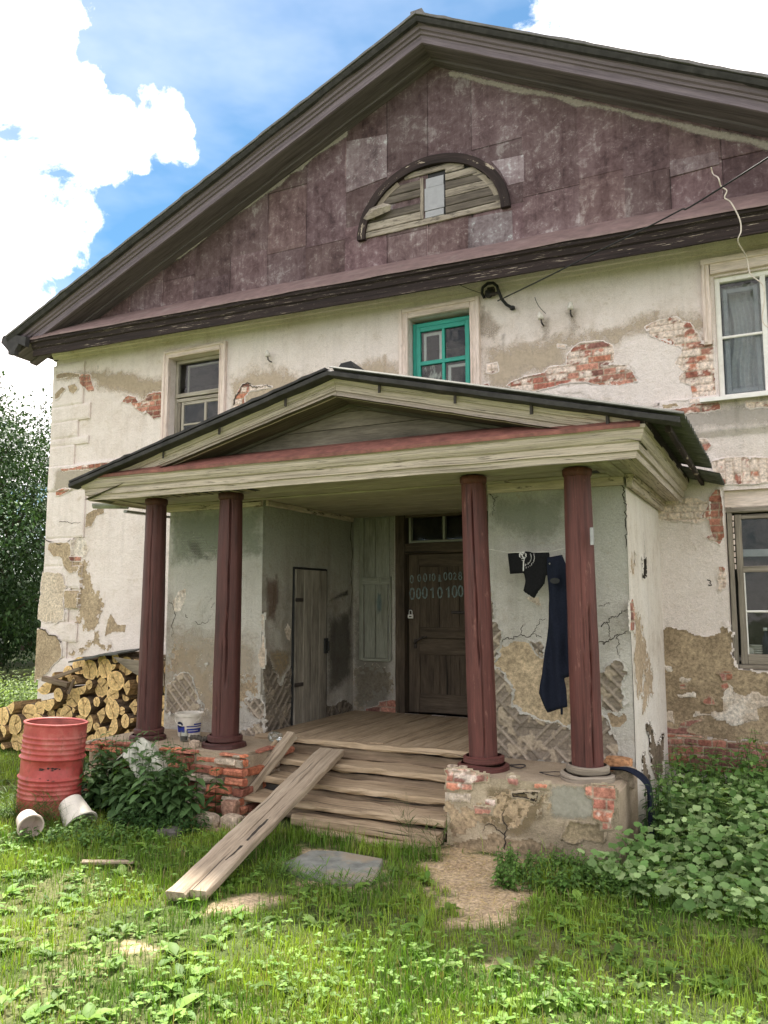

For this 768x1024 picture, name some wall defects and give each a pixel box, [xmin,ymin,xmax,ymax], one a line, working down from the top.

flaking render [121,391,161,420]
flaking render [233,383,273,408]
flaking render [506,340,638,392]
flaking render [644,316,721,416]
flaking render [658,437,768,547]
flaking render [34,509,127,682]
crack [502,619,543,642]
crack [599,602,627,656]
flaking render [494,640,571,726]
flaking render [606,597,768,777]
crack [483,811,508,850]
flaking render [443,755,649,856]